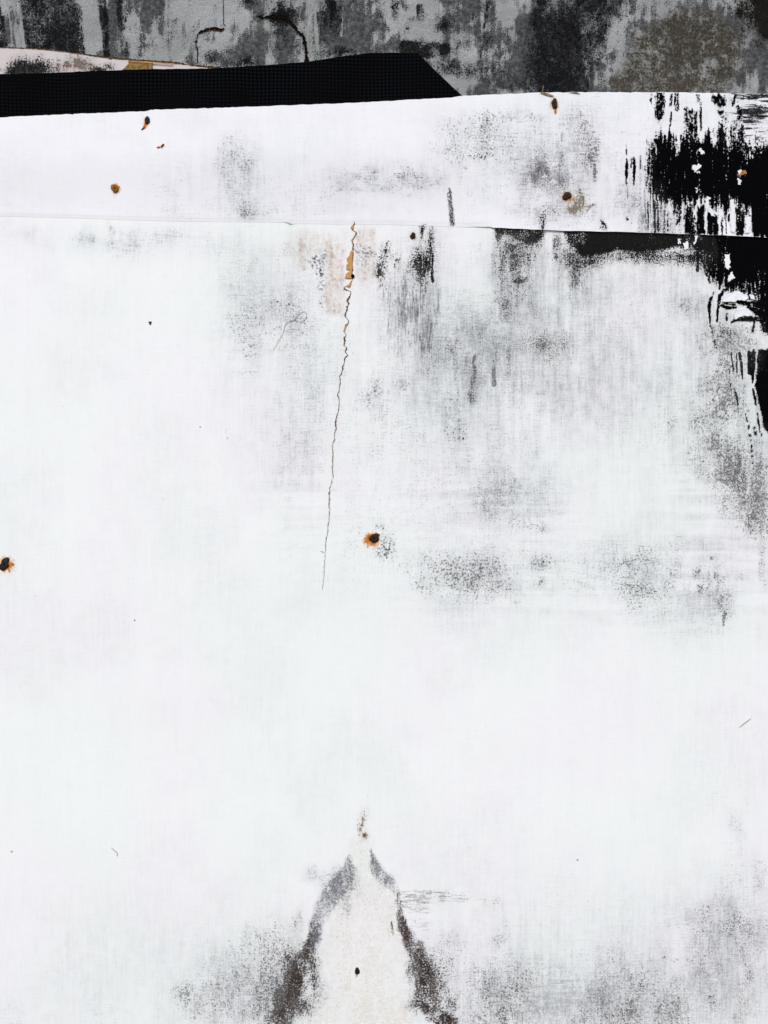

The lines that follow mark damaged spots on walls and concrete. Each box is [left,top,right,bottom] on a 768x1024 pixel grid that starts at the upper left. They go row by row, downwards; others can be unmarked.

corrosion [563,189,595,216]
peeling [625,92,768,476]
crack [321,222,357,588]
leakage [180,856,357,1024]
leakage [370,851,540,1024]